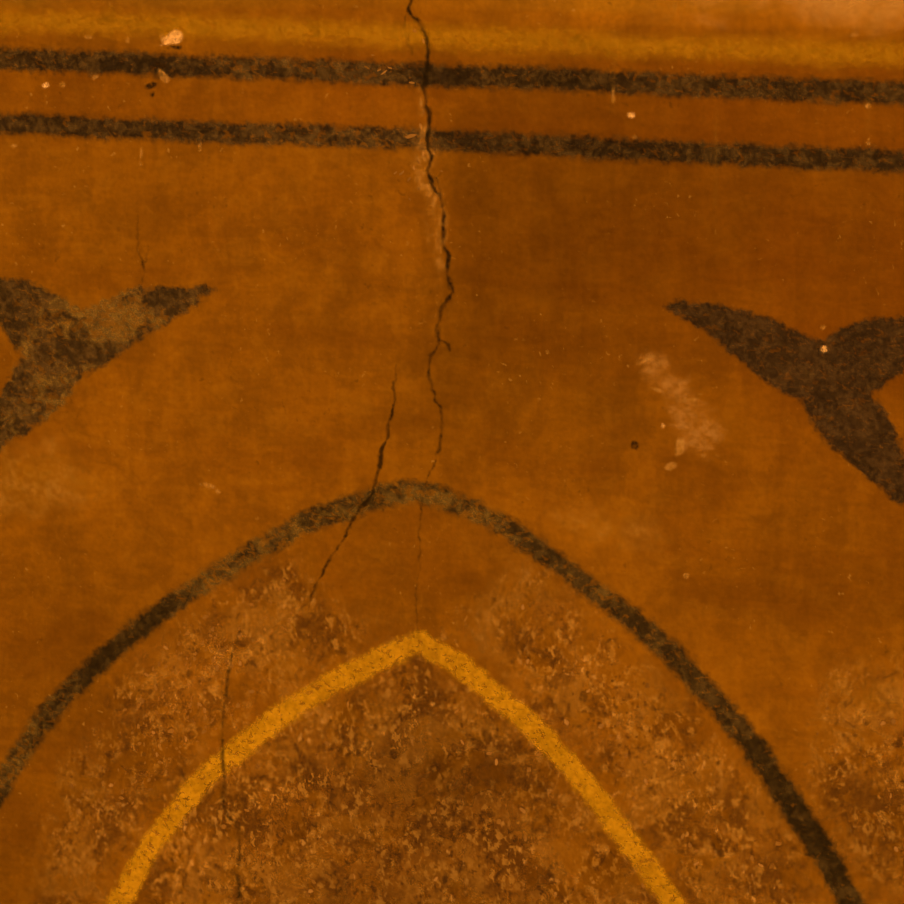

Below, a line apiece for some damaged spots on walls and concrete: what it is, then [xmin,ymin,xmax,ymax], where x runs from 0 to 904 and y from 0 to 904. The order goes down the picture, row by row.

crack [364,0,453,300]
crack [322,405,394,576]